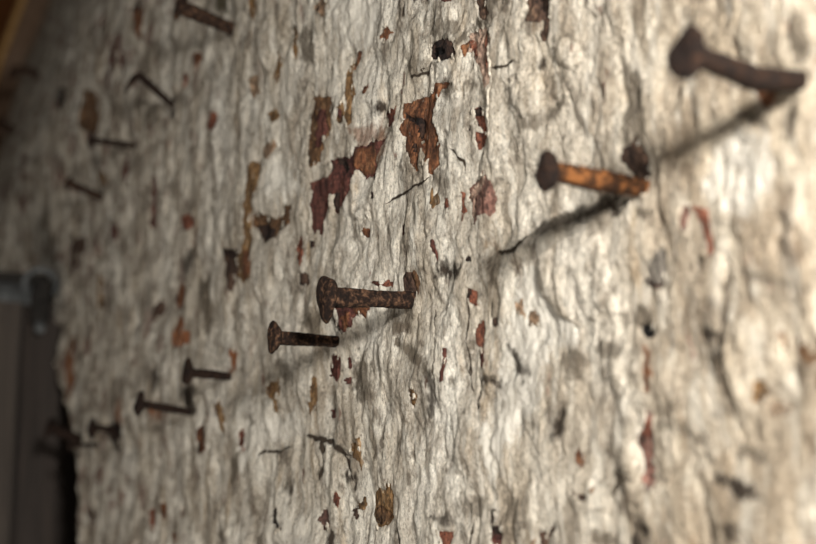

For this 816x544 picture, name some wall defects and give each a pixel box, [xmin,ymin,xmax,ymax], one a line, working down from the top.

peeling [428,0,491,87]
peeling [525,0,550,44]
peeling [384,82,452,174]
peeling [222,137,291,295]
peeling [295,134,385,290]
crack [386,177,429,204]
peeling [461,166,497,225]
crack [497,195,621,254]
crack [465,291,482,414]
crack [257,434,354,481]
peeling [352,480,394,531]